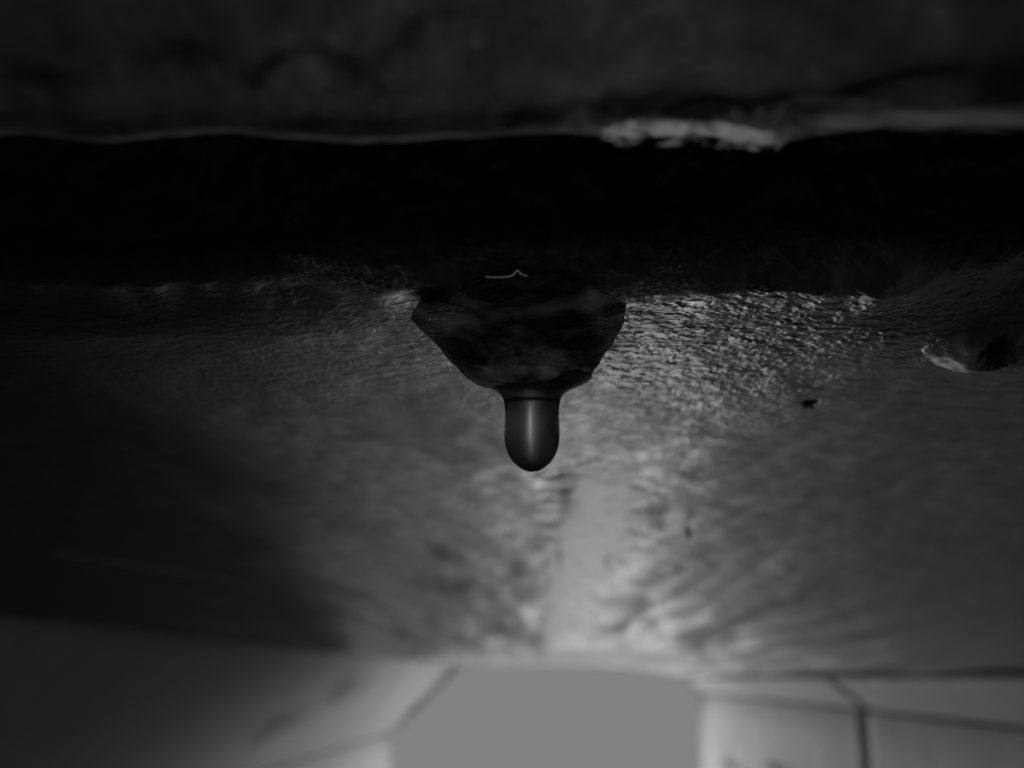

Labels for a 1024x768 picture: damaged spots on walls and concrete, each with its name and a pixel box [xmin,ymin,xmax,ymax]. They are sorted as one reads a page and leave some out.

spalling [903,341,980,373]